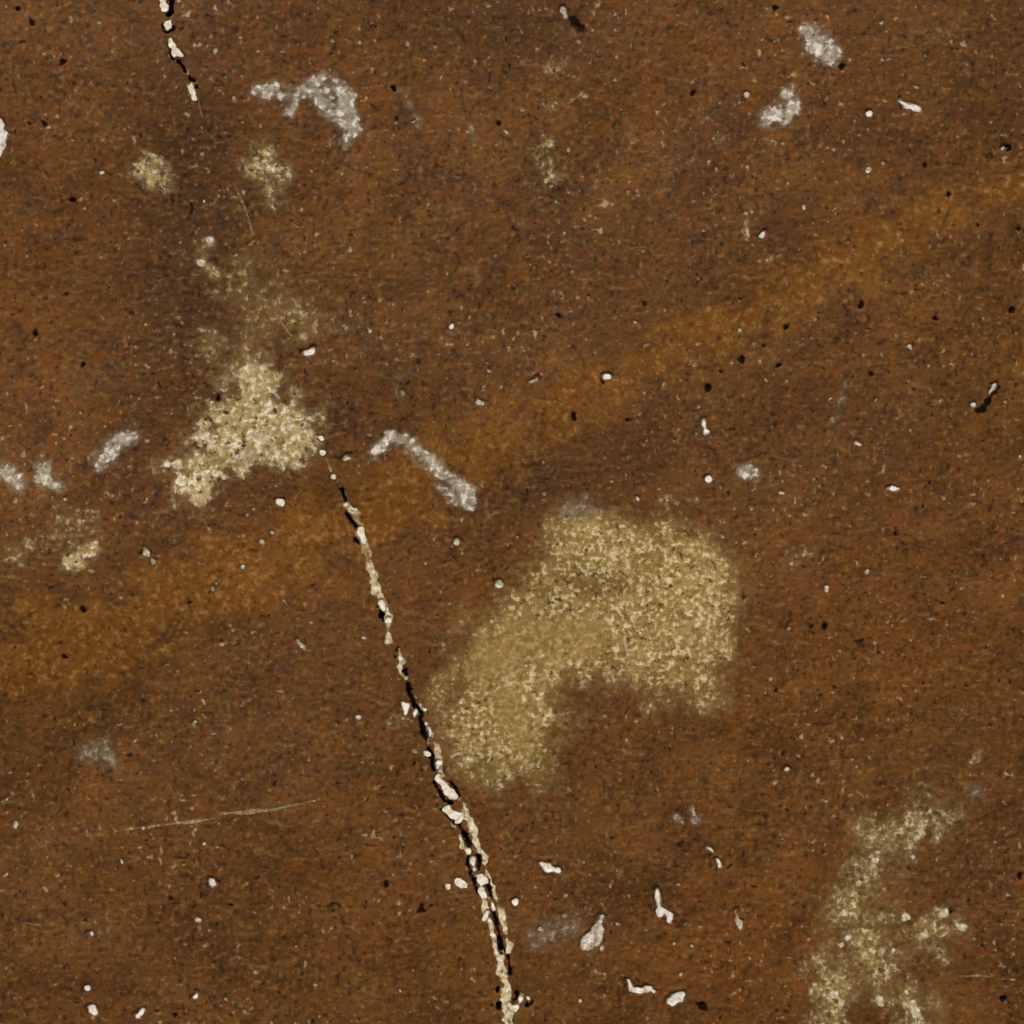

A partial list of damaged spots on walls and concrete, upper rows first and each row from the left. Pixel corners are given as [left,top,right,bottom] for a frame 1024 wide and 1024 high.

crack [159,0,201,111]
crack [314,436,533,1024]